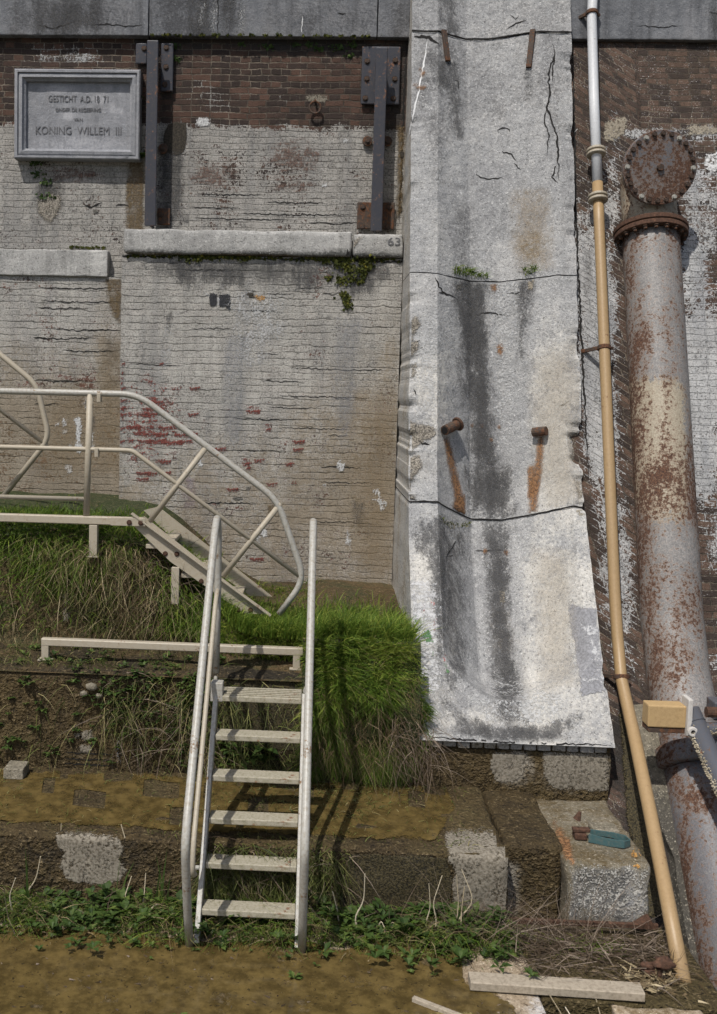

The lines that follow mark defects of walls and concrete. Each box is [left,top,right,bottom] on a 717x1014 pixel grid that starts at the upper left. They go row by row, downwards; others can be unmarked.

crack [544,45,560,183]
crack [476,127,521,180]
water stain [704,152,717,174]
water stain [688,188,717,257]
peeling [120,362,200,482]
rust [444,438,465,514]
water stain [443,280,583,742]
rust [528,437,543,513]
water stain [414,516,466,690]